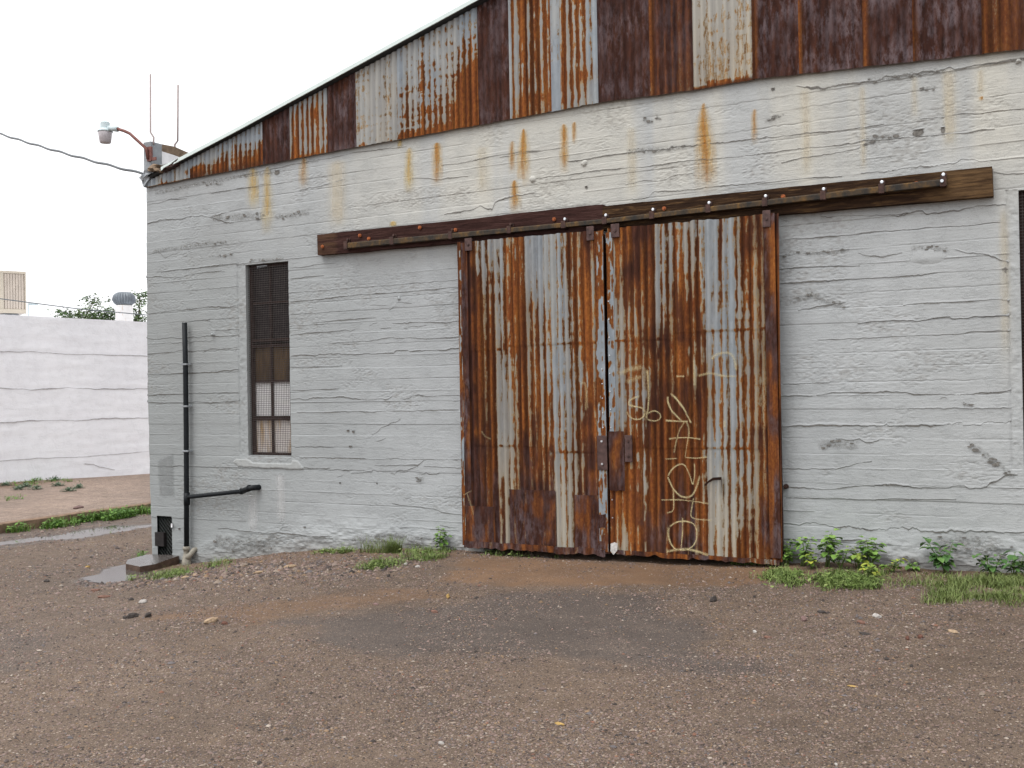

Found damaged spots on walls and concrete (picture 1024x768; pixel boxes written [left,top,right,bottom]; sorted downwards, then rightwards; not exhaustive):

rust [511,129,527,166]
rust [699,105,711,168]
crack [411,107,1024,215]
crack [782,381,1024,545]